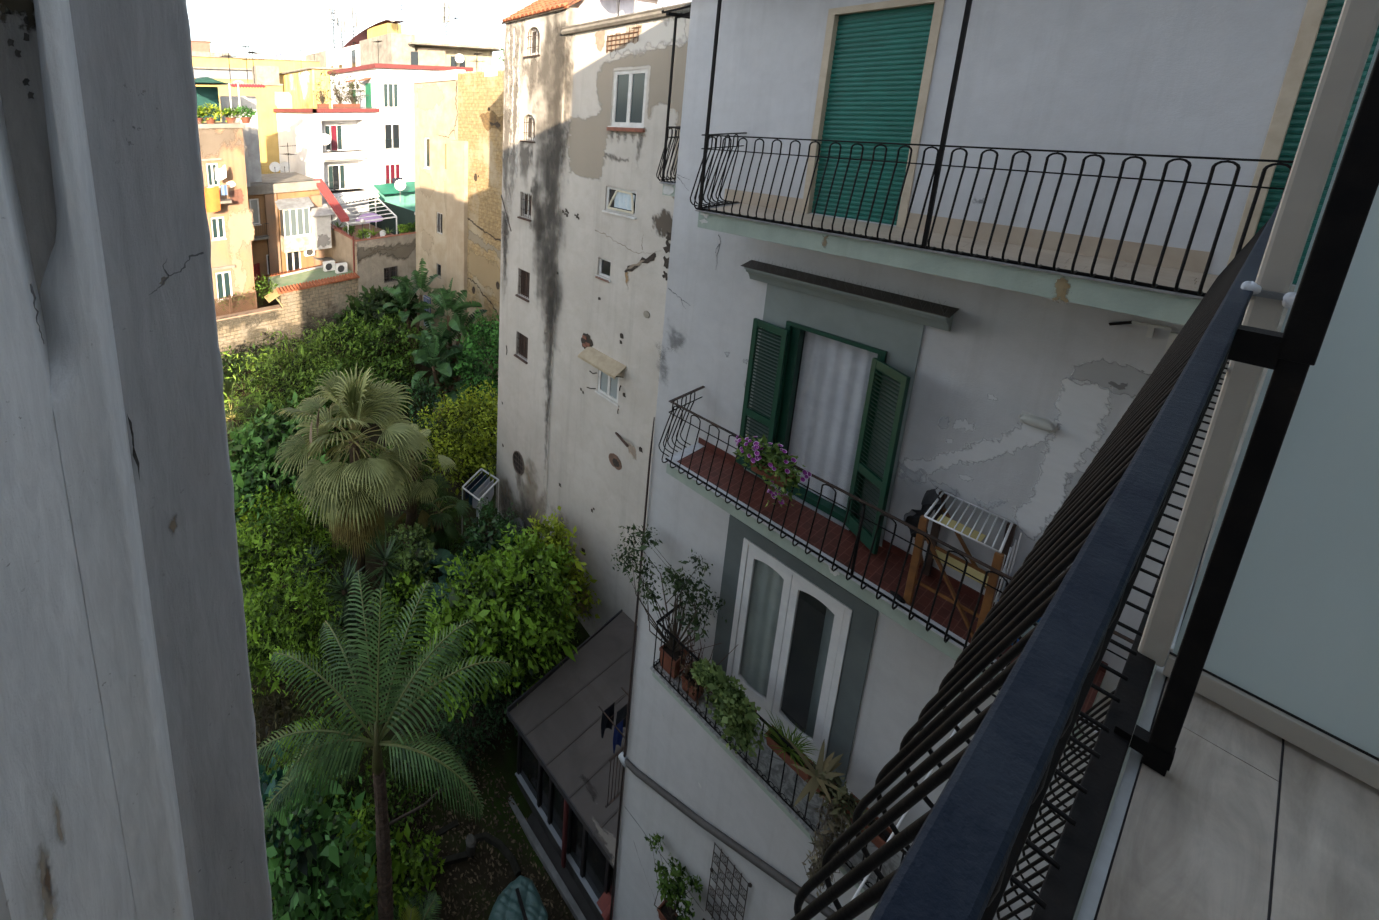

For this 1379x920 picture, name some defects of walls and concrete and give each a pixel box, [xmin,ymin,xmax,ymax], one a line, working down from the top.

spalling [595,23,642,53]
damp [502,0,576,418]
crack [149,252,204,295]
corrosion [38,849,56,920]